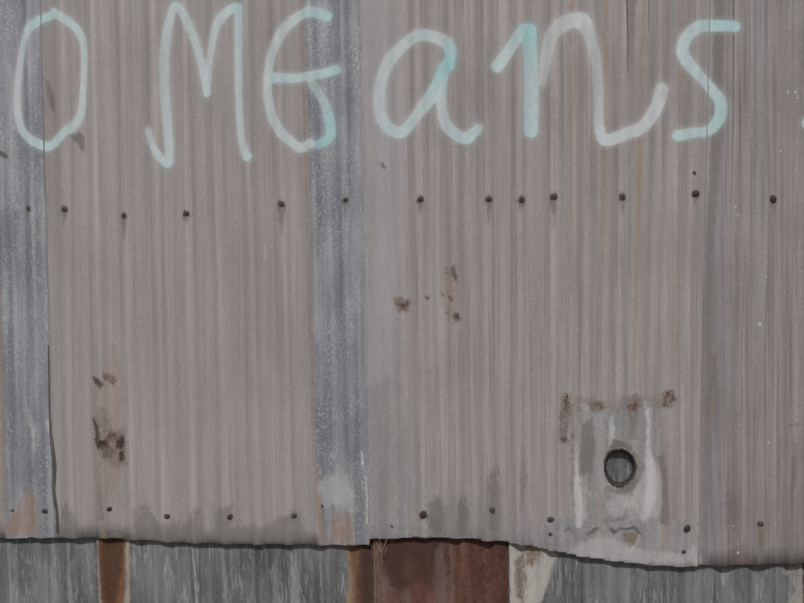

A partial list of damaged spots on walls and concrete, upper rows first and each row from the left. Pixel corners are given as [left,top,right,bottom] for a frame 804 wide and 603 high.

rust [394,297,410,312]
rust [92,410,125,467]
rust [560,394,574,443]
rust [97,498,131,603]
rust [318,513,440,603]